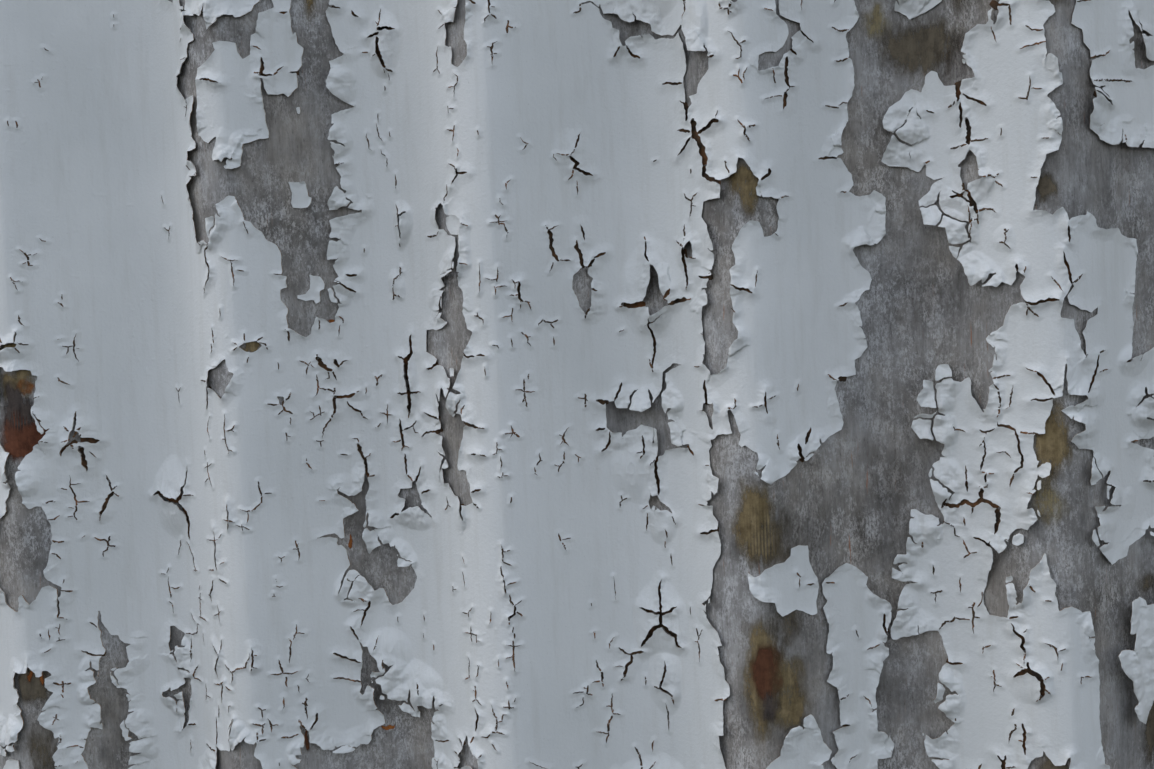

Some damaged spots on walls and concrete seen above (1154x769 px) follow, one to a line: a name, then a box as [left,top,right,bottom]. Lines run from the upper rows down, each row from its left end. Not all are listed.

rust [2,370,49,460]
peeling [0,335,93,620]
crack [155,415,310,735]
peeling [161,0,371,342]
crack [277,326,451,510]
peeling [281,619,485,769]
peeling [422,185,481,522]
crack [573,530,702,752]
crack [619,31,788,372]
rust [743,622,784,738]
peeling [596,0,1154,769]
crack [921,368,1091,769]